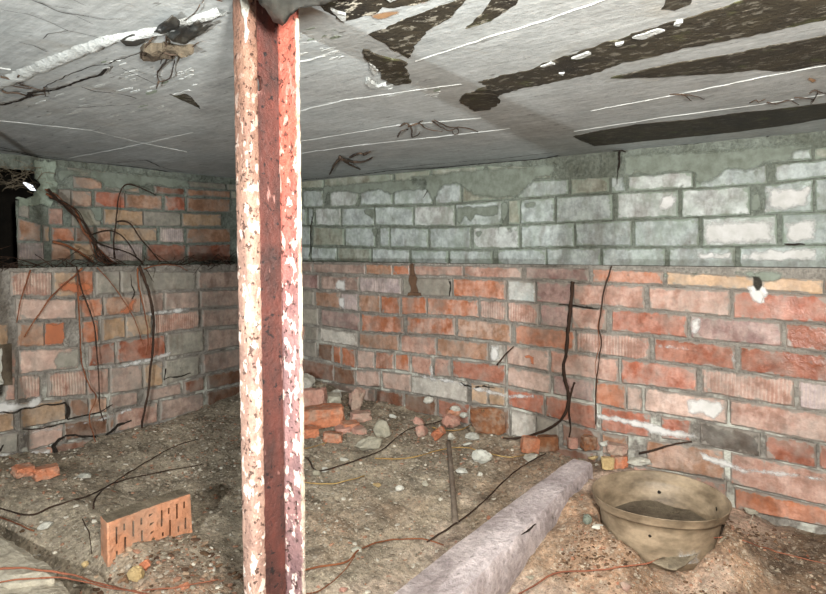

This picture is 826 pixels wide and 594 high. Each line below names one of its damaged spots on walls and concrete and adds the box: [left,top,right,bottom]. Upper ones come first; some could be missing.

peeling [459,0,826,111]
peeling [295,0,466,241]
peeling [573,103,826,146]
efflorescence [688,399,723,418]